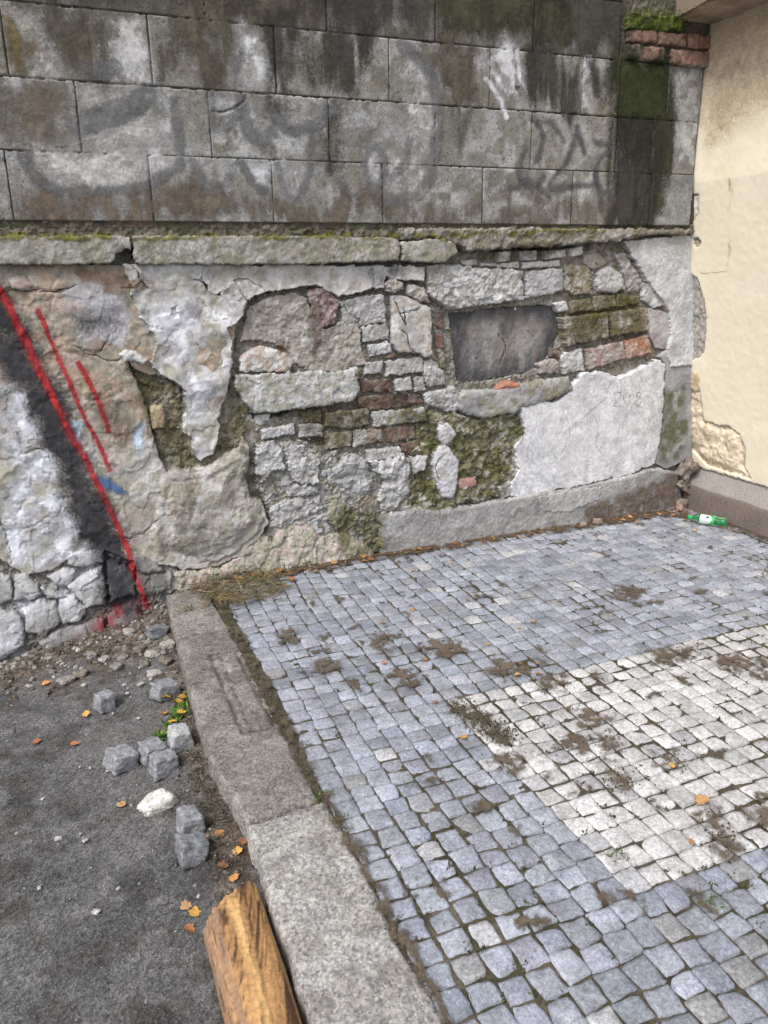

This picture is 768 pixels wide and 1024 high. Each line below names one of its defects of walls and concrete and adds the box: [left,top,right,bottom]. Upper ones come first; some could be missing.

water stain [6,0,111,87]
crack [127,236,150,289]
water stain [20,171,483,229]
water stain [152,0,675,229]
flaking render [0,240,670,665]
flaking render [691,275,751,479]